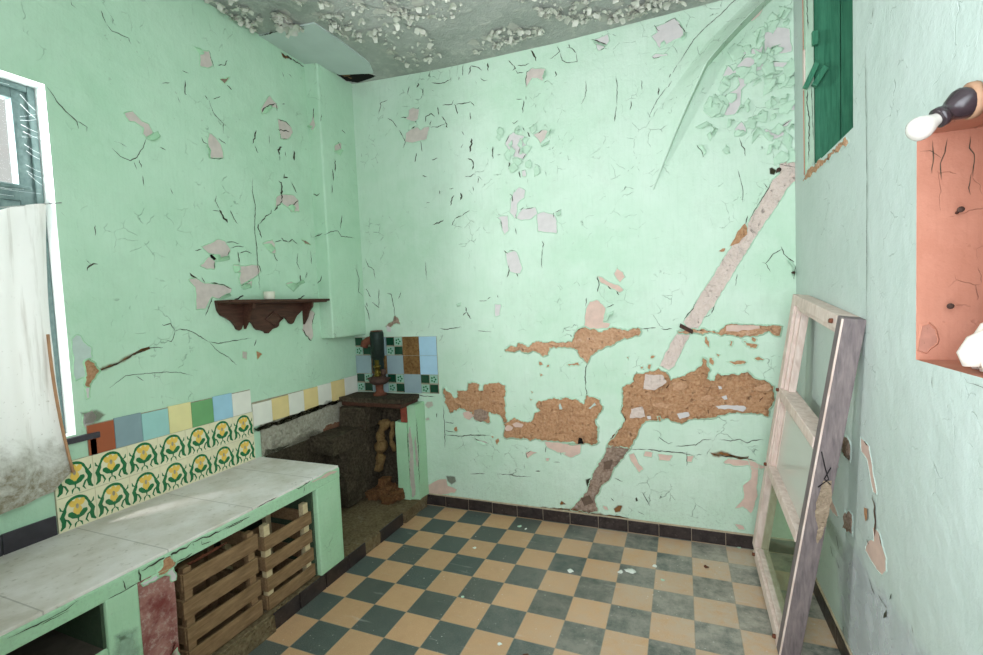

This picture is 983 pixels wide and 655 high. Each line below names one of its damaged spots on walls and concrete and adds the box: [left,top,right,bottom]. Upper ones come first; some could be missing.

peeling [192,45,232,90]
peeling [204,0,463,68]
crack [253,132,336,196]
peeling [399,107,435,150]
crack [379,45,577,225]
peeling [188,239,261,316]
crack [213,181,272,285]
flaking render [407,0,850,514]
crack [102,323,248,384]
peeling [302,310,315,341]
peeling [830,434,887,577]